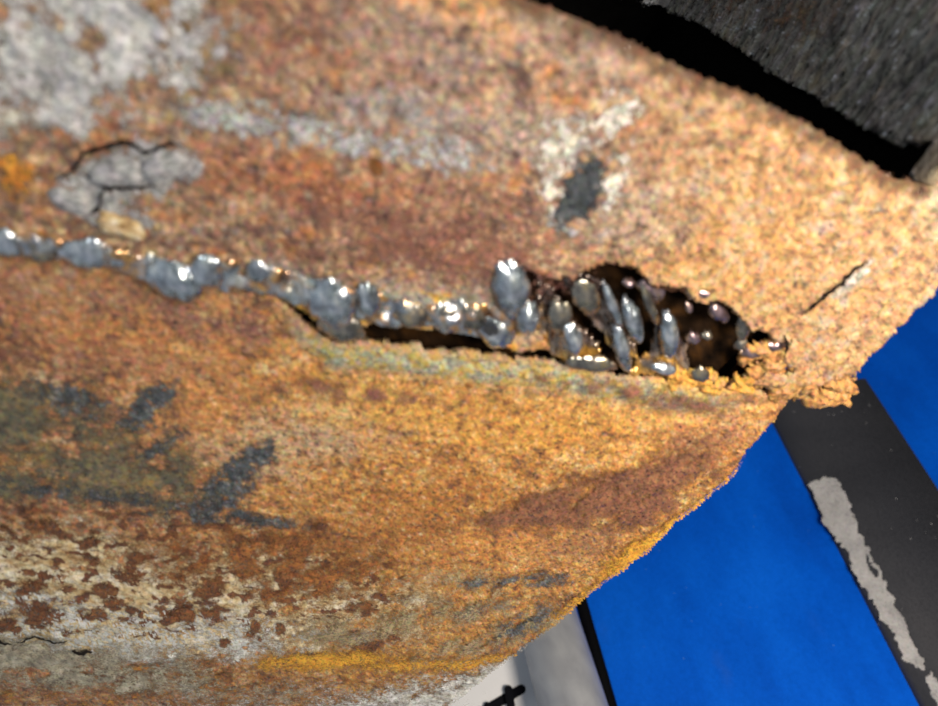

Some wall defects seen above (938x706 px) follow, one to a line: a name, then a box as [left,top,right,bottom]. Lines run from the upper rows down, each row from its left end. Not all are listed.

peeling [0,0,240,154]
rust [0,153,39,202]
peeling [89,145,192,187]
peeling [46,186,146,241]
rust [257,186,570,296]
rust [362,384,387,403]
rust [530,374,737,413]
rust [446,430,738,630]
rust [0,499,517,706]
crack [0,636,92,656]